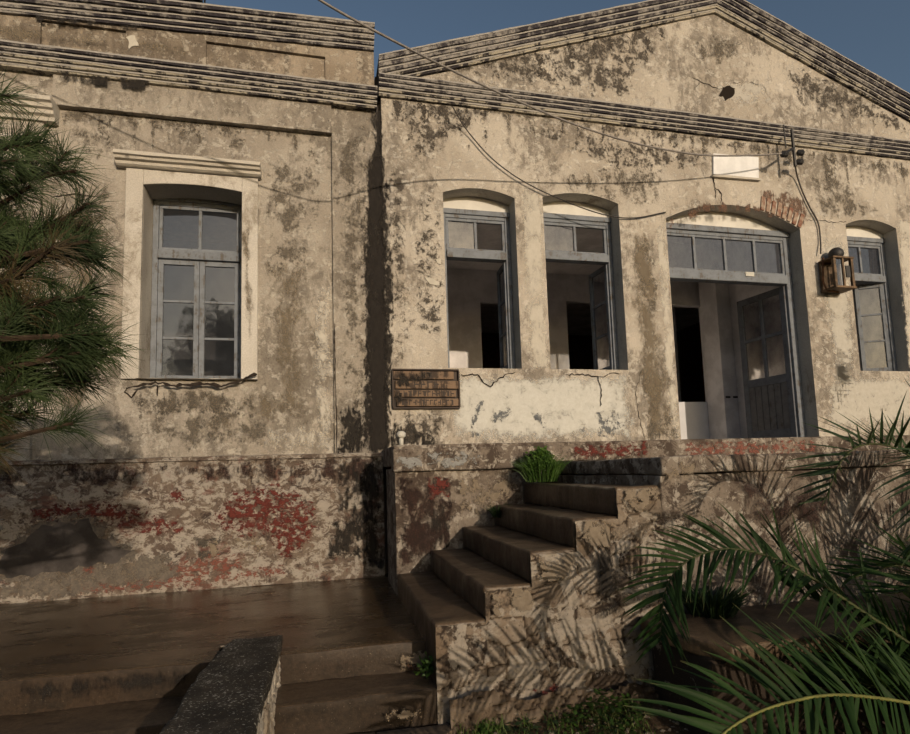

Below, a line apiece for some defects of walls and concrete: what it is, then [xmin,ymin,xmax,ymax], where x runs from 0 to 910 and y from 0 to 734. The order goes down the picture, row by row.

damp [460,26,665,97]
spalling [717,82,766,103]
damp [392,100,908,215]
flaking render [760,190,811,228]
damp [135,107,444,569]
damp [632,233,678,440]
crack [462,372,515,387]
crack [566,370,645,440]
peeling [574,441,649,459]
peeling [31,500,185,537]
peeling [81,483,317,594]
damp [399,477,453,566]